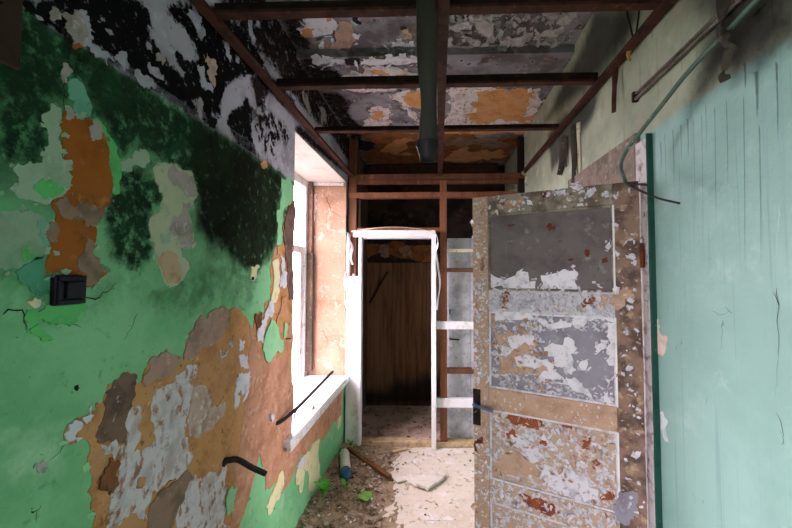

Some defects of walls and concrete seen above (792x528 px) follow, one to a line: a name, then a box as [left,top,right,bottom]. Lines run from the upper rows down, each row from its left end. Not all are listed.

peeling [296,18,418,77]
peeling [448,12,577,51]
damp [0,0,377,271]
peeling [342,88,422,164]
peeling [433,86,545,163]
peeling [0,62,198,309]
spalling [59,177,343,528]
peeling [657,319,668,356]